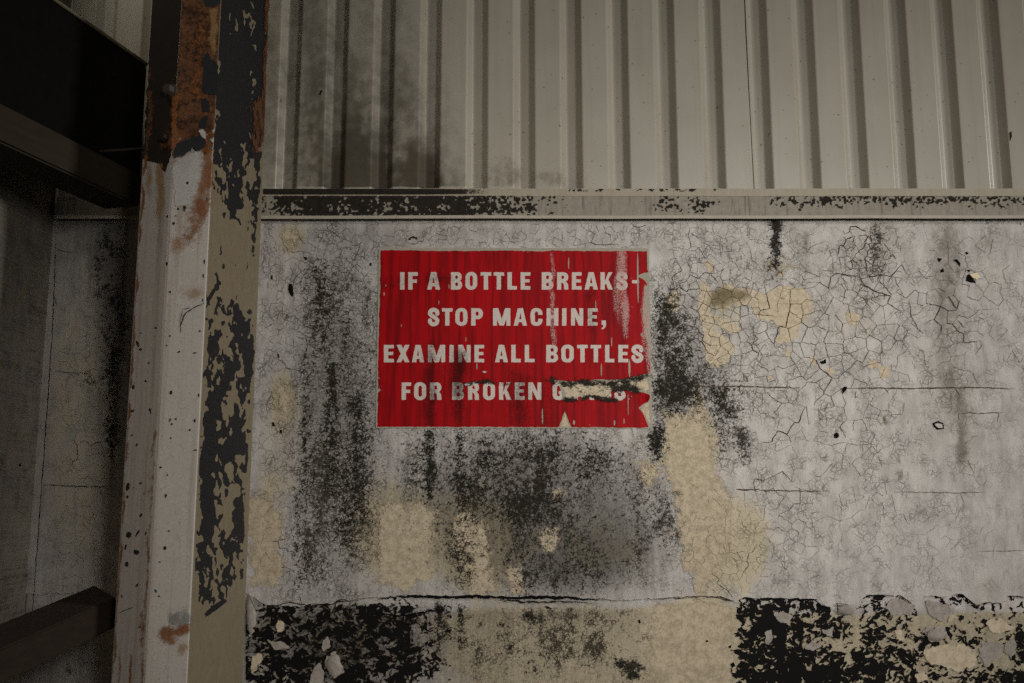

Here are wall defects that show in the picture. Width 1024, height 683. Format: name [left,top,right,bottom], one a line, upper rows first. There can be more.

corrosion [138,0,221,248]
damp [767,219,785,274]
peeling [143,0,288,618]
peeling [697,255,813,369]
crack [248,224,1024,617]
damp [282,247,752,682]
flaking render [251,653,263,673]
peeling [267,620,289,650]
peeling [310,663,324,683]
peeling [765,611,793,645]
peeling [805,627,834,651]
flaking render [915,618,1017,683]